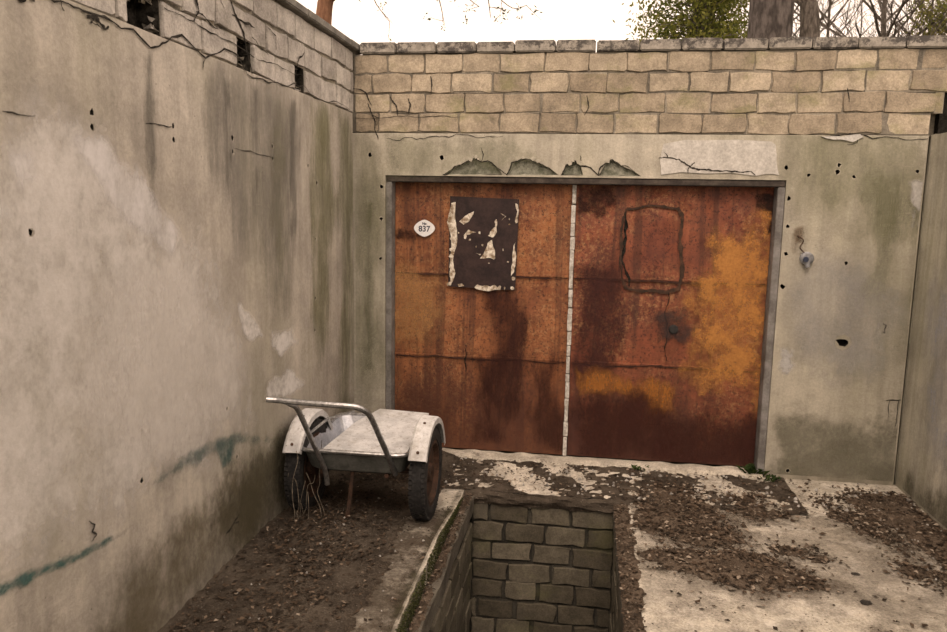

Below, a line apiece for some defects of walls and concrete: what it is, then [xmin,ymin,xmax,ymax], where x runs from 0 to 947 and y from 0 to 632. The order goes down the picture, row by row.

crack [51,0,633,176]
spalling [445,155,583,175]
spalling [600,157,640,176]
crack [660,153,755,175]
corrosion [577,187,615,217]
corrosion [757,193,774,233]
corrosion [396,354,577,364]